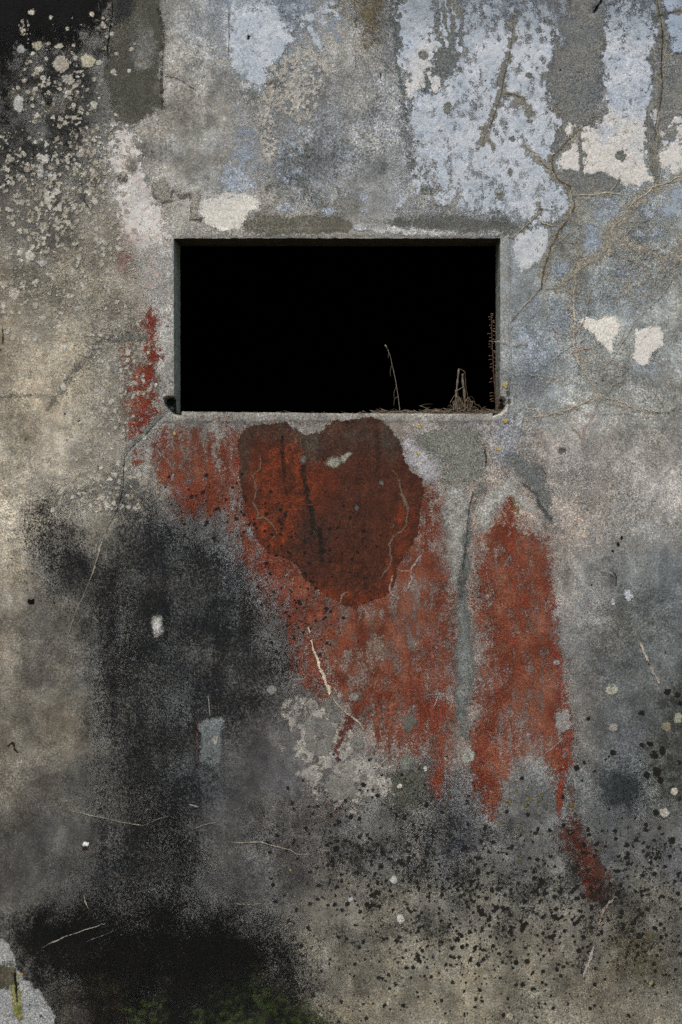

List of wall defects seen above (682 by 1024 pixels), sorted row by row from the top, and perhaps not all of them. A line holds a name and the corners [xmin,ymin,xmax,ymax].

peeling [382,0,682,277]
crack [475,0,682,469]
peeling [579,316,664,383]
leakage [0,412,682,1024]
rust [117,307,616,910]